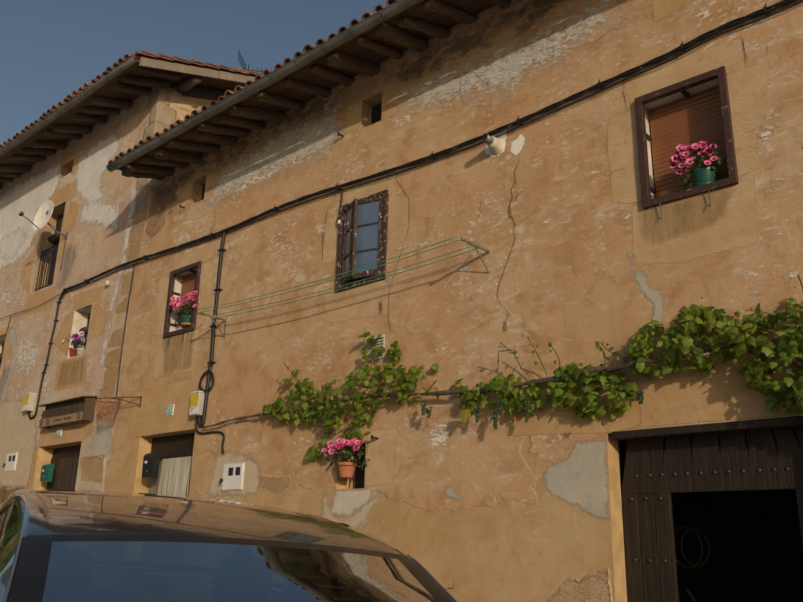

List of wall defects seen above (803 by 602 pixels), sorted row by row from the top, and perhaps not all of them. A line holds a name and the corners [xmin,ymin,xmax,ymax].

peeling [205,104,345,208]
peeling [0,163,61,276]
peeling [75,129,138,366]
crack [497,160,519,366]
flaking render [546,568,613,602]